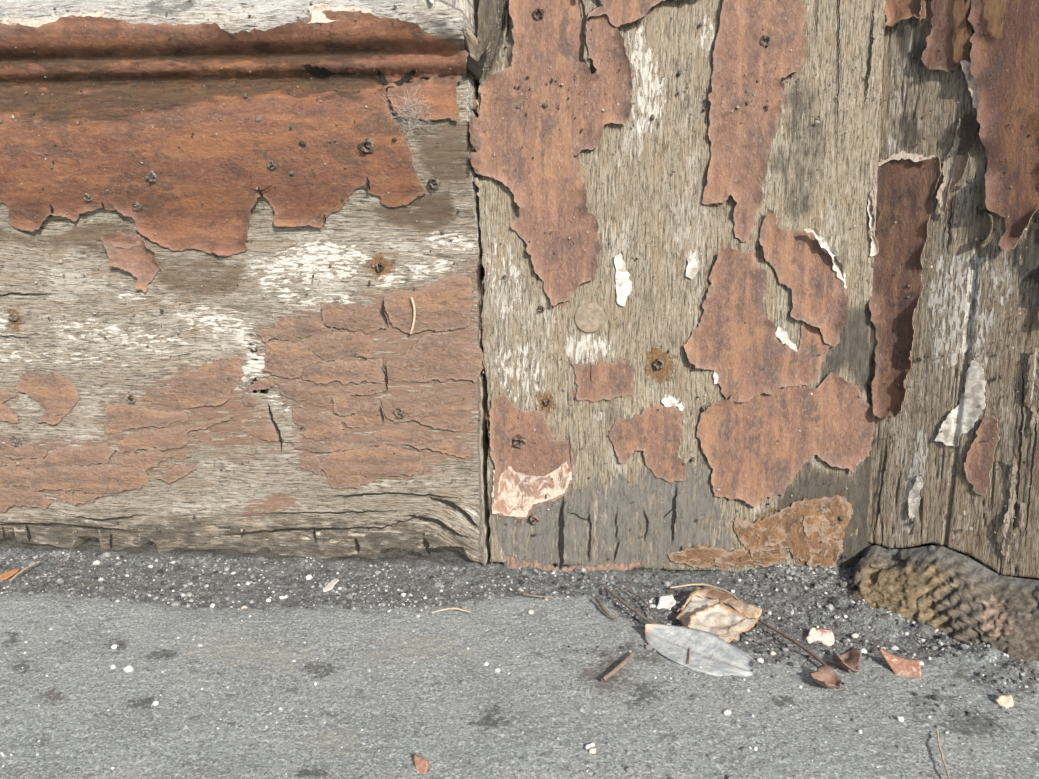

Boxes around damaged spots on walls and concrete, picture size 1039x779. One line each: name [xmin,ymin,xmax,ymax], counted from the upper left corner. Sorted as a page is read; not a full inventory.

peeling [0,0,666,308]
crack [465,0,509,80]
crack [580,0,603,78]
crack [815,0,875,163]
peeling [608,0,1039,569]
peeling [0,259,577,521]
peeling [569,356,636,404]